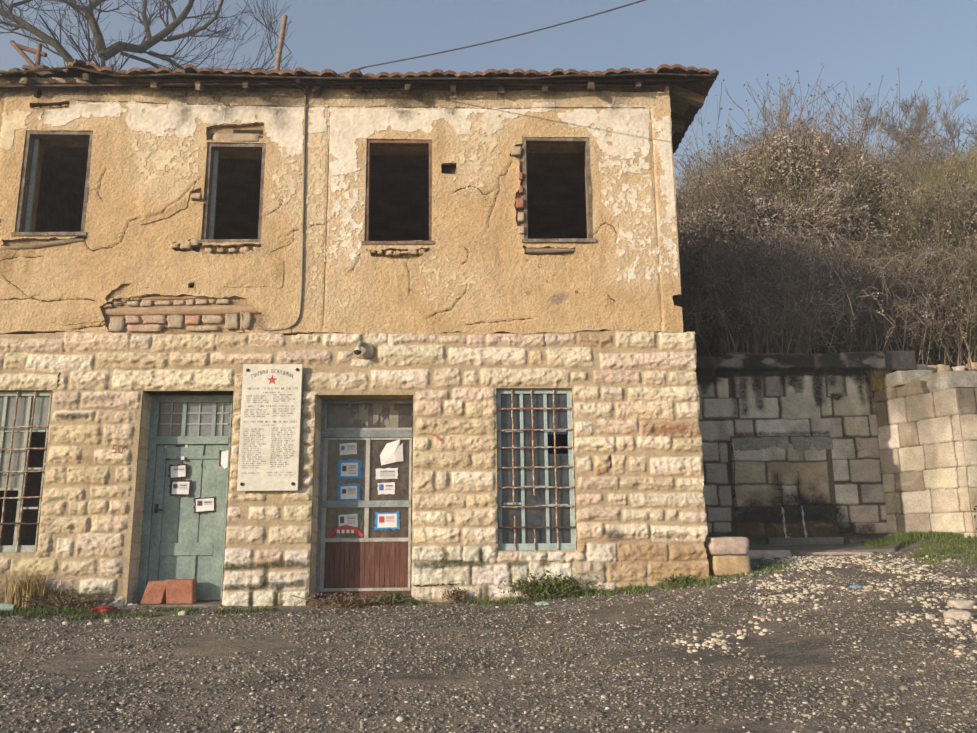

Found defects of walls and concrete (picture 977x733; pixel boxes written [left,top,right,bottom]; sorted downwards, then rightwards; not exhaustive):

peeling [0,89,678,308]
crack [455,170,508,227]
crack [0,244,111,330]
flaking render [102,284,262,334]
crack [429,289,532,325]
leakage [695,367,873,415]
leakage [742,476,845,522]